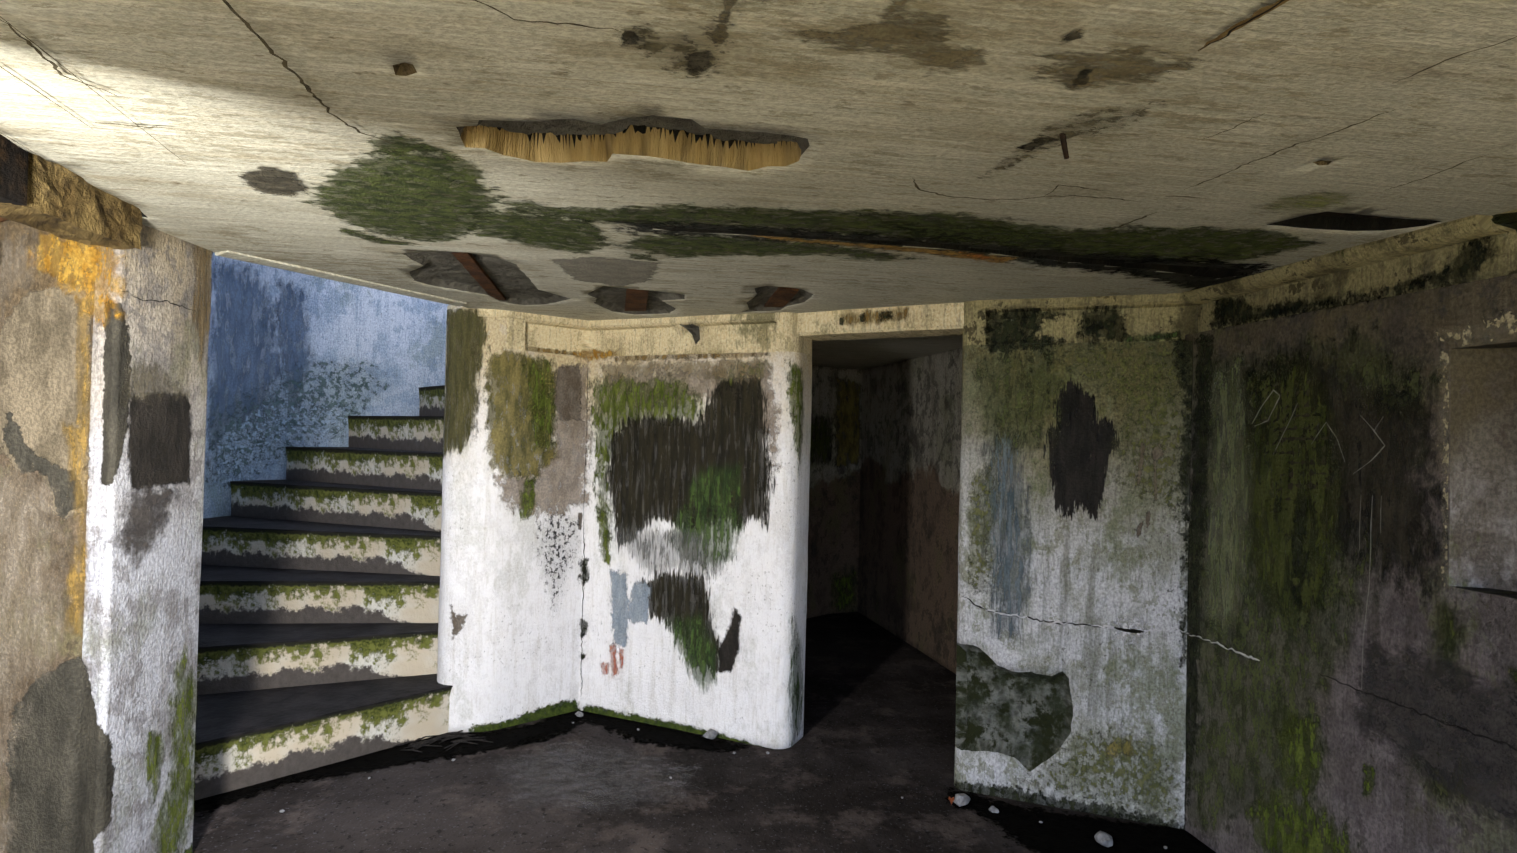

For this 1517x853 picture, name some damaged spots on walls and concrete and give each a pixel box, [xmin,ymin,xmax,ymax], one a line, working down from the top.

crack [473,0,621,32]
crack [1198,0,1289,51]
crack [0,16,184,162]
crack [222,0,405,148]
spalling [456,115,810,171]
damp [338,228,416,245]
damp [553,257,660,286]
damp [613,220,1270,290]
spalling [1267,211,1441,231]
crack [962,596,1260,661]
spalling [955,643,1073,771]